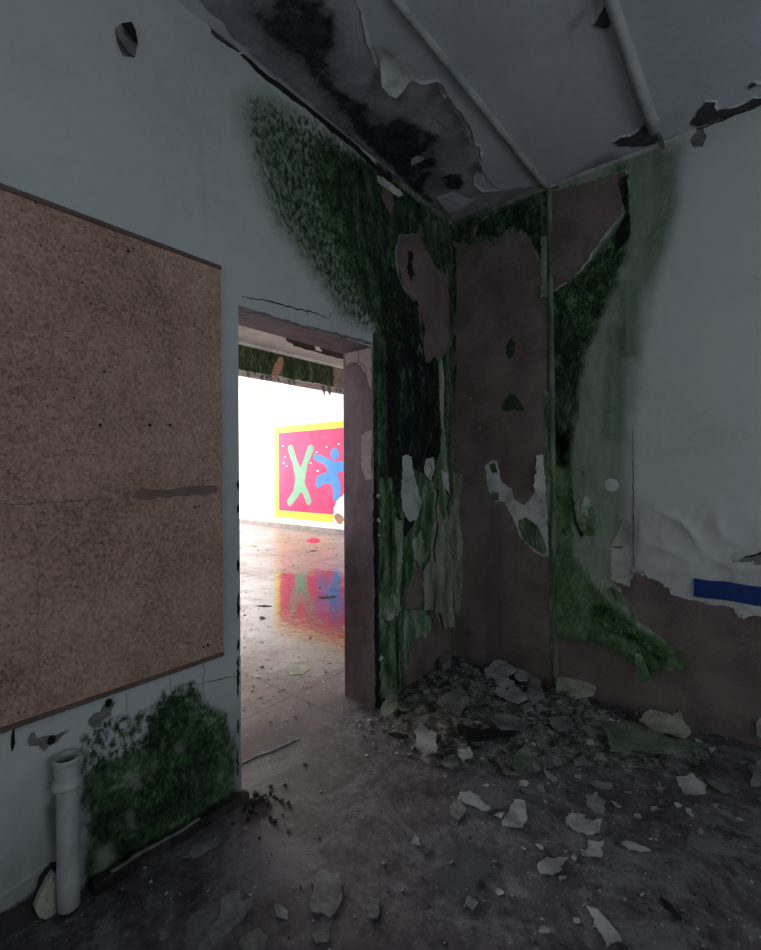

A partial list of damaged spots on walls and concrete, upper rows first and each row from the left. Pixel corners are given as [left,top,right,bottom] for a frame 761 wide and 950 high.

spalling [591,0,611,30]
peeling [115,22,138,58]
spalling [199,0,539,221]
spalling [611,111,665,150]
spalling [690,80,761,148]
crack [242,296,332,329]
leakage [256,0,673,615]
spalling [361,169,761,752]
leakage [374,510,432,708]
spalling [86,697,116,730]
spalling [27,726,71,752]